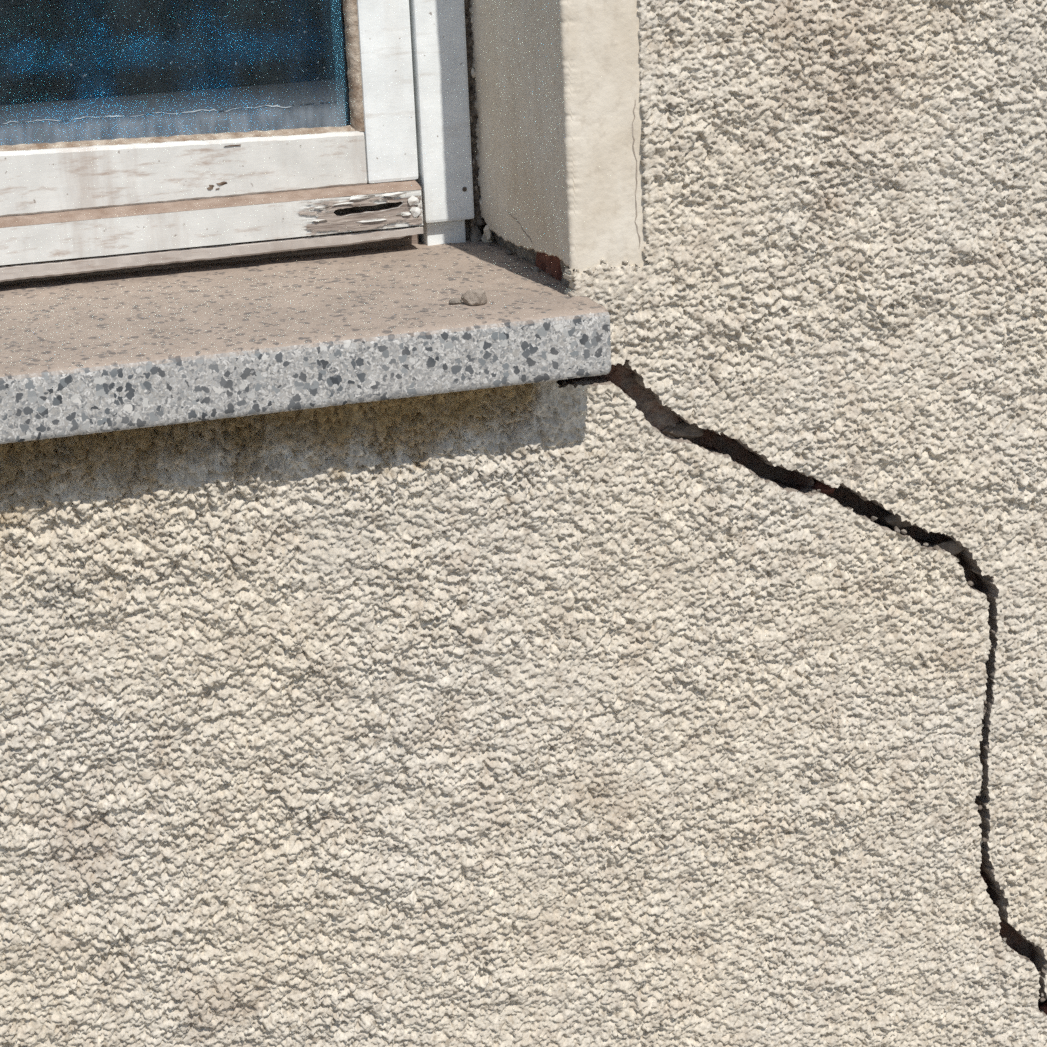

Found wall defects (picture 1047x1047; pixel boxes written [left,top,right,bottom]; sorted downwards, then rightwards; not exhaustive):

crack [556,359,1047,1017]